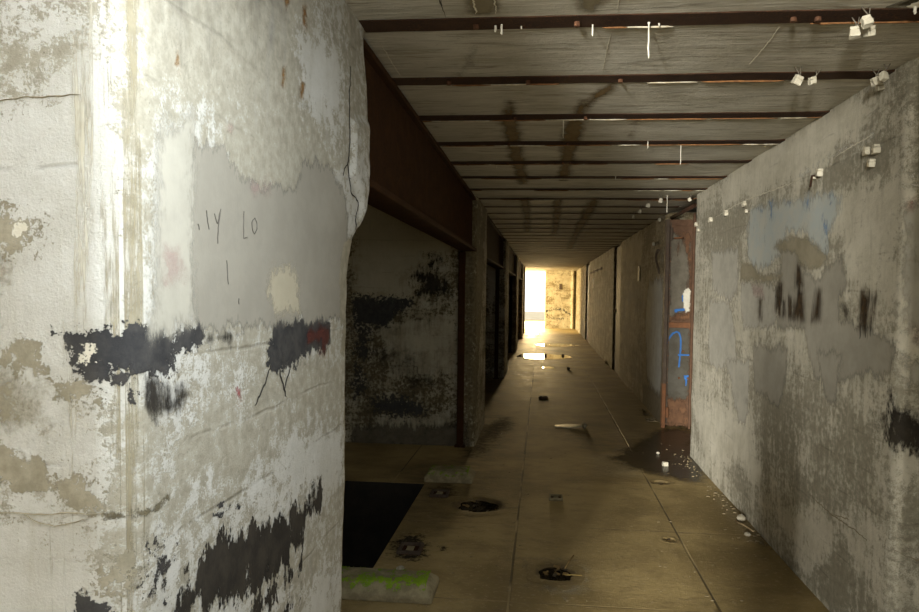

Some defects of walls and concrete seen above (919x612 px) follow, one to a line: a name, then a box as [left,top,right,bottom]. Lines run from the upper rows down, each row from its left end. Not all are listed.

peeling [125,0,137,111]
crack [0,93,80,101]
crack [343,66,359,238]
leakage [409,253,453,302]
leakage [0,374,32,424]
peeling [0,136,323,612]
corrosion [667,398,688,427]
crack [0,512,102,527]